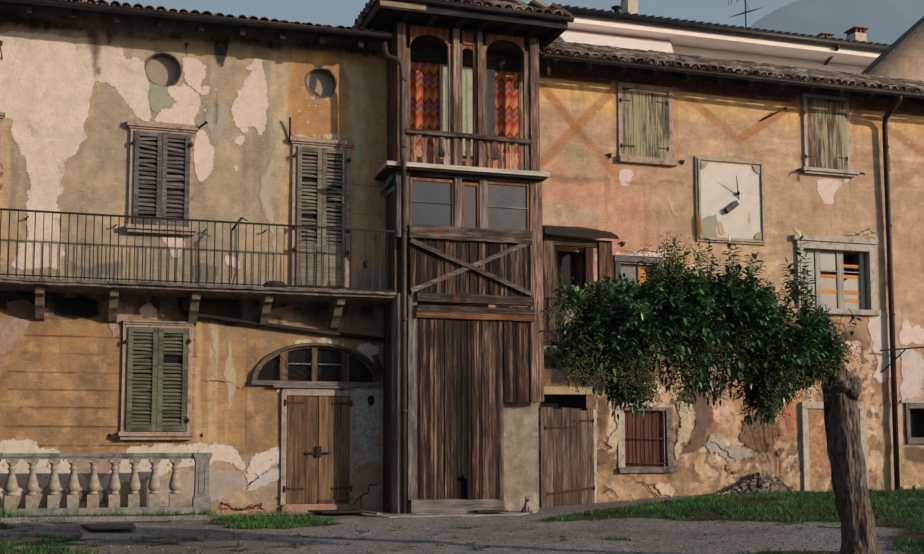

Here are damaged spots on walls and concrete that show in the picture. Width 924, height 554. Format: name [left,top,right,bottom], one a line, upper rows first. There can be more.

flaking render [0,29,269,270]
flaking render [816,178,850,204]
flaking render [100,295,166,339]
flaking render [867,312,924,400]
flaking render [0,437,88,507]
flaking render [99,434,281,513]
flaking render [354,387,381,469]
flaking render [674,391,785,474]